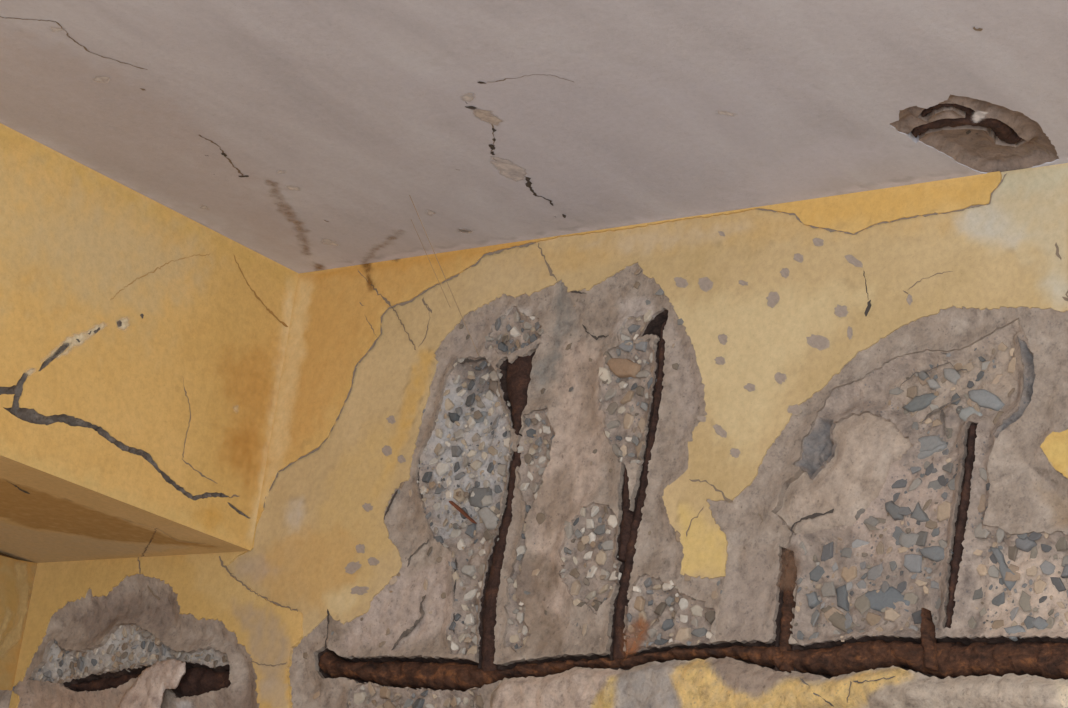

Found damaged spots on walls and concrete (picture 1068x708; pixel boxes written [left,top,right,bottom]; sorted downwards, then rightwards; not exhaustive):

crack [0,16,147,70]
crack [462,74,573,218]
rust [911,103,1032,144]
crack [234,255,288,327]
crack [358,271,432,350]
crack [538,243,586,294]
crack [0,254,249,519]
crack [460,358,498,367]
peeling [227,94,1068,708]
rust [318,321,1068,692]
spalling [0,573,259,708]